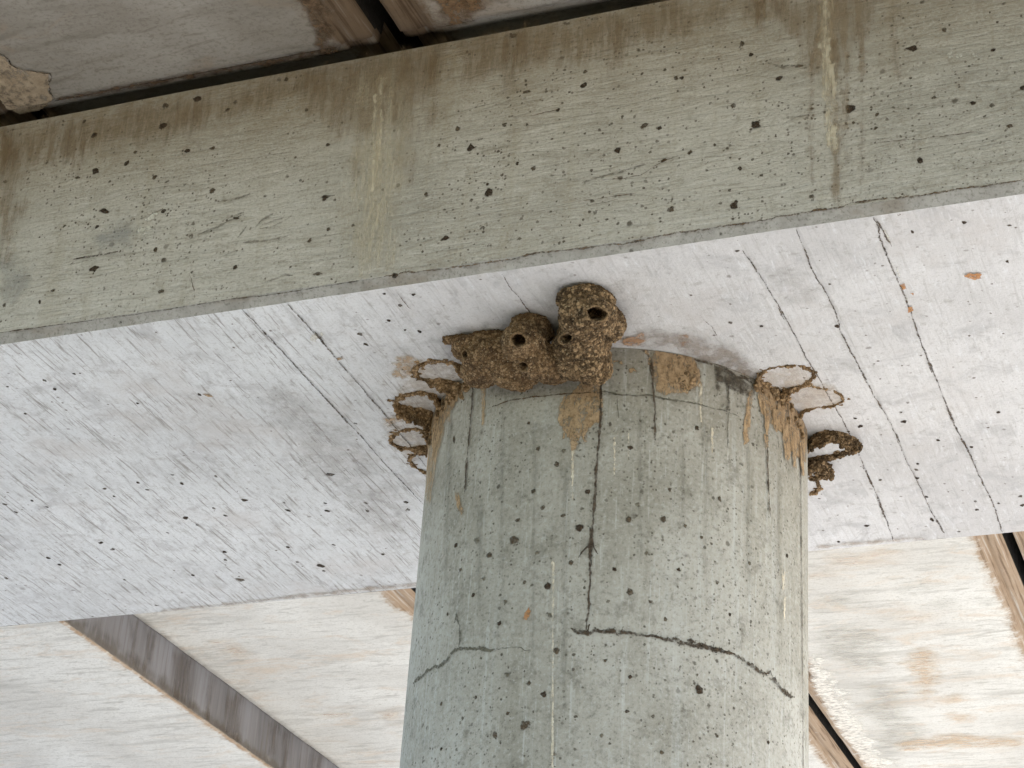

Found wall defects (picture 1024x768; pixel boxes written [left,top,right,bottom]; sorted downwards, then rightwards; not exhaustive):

spalling [0,56,53,114]
leakage [818,0,838,149]
crack [384,179,1023,540]
crack [464,350,803,698]
crack [413,612,527,684]